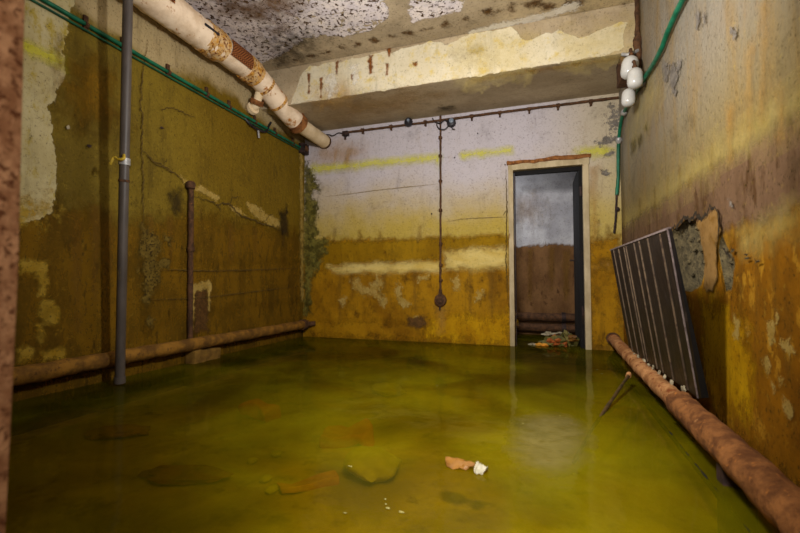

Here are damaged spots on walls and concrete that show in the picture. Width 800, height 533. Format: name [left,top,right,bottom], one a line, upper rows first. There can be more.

peeling [185,0,389,64]
peeling [408,0,464,23]
peeling [19,0,75,223]
crack [140,39,284,233]
damp [13,200,118,367]
damp [126,153,575,355]
peeling [338,272,412,308]
spalling [672,220,705,292]
damp [590,112,800,487]
spalling [719,235,735,291]
damp [12,366,115,402]
damp [125,353,185,376]